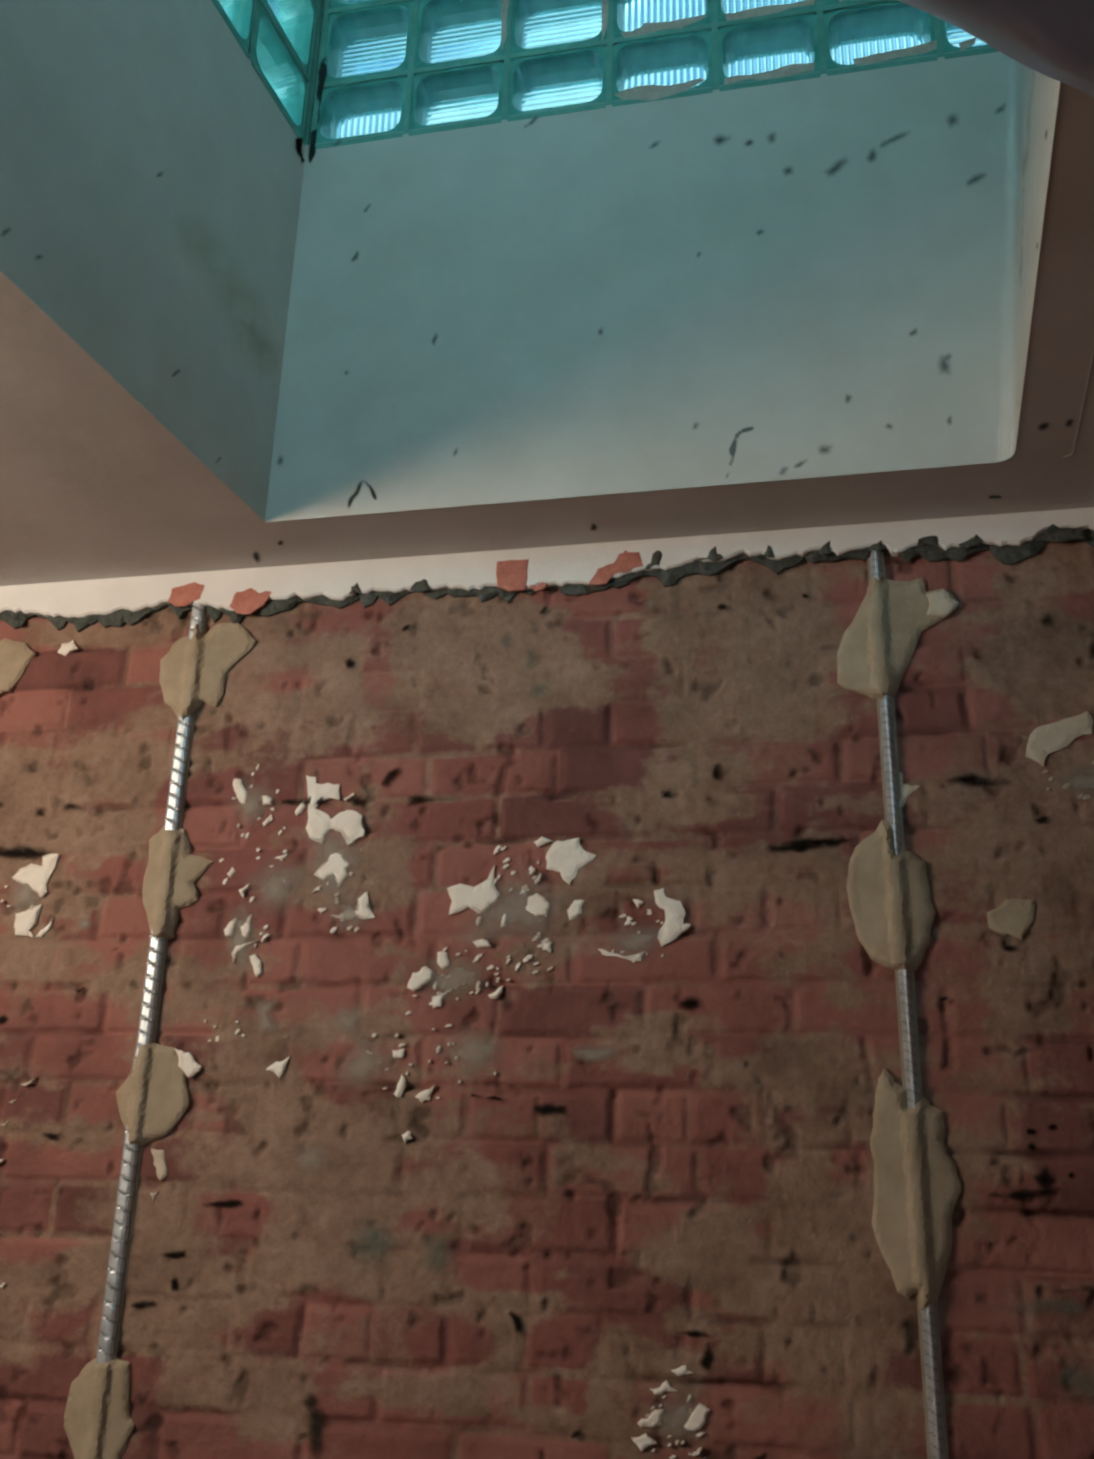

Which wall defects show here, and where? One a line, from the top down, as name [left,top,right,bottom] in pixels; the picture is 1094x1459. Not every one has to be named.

flaking render [0,524,1094,656]
peeling [1025,711,1093,767]
peeling [233,779,273,827]
peeling [295,775,365,893]
peeling [12,854,60,938]
peeling [224,867,263,977]
peeling [447,865,507,948]
peeling [526,836,597,920]
peeling [598,888,691,961]
peeling [407,951,449,1008]
peeling [392,1049,435,1102]
peeling [631,1331,712,1451]